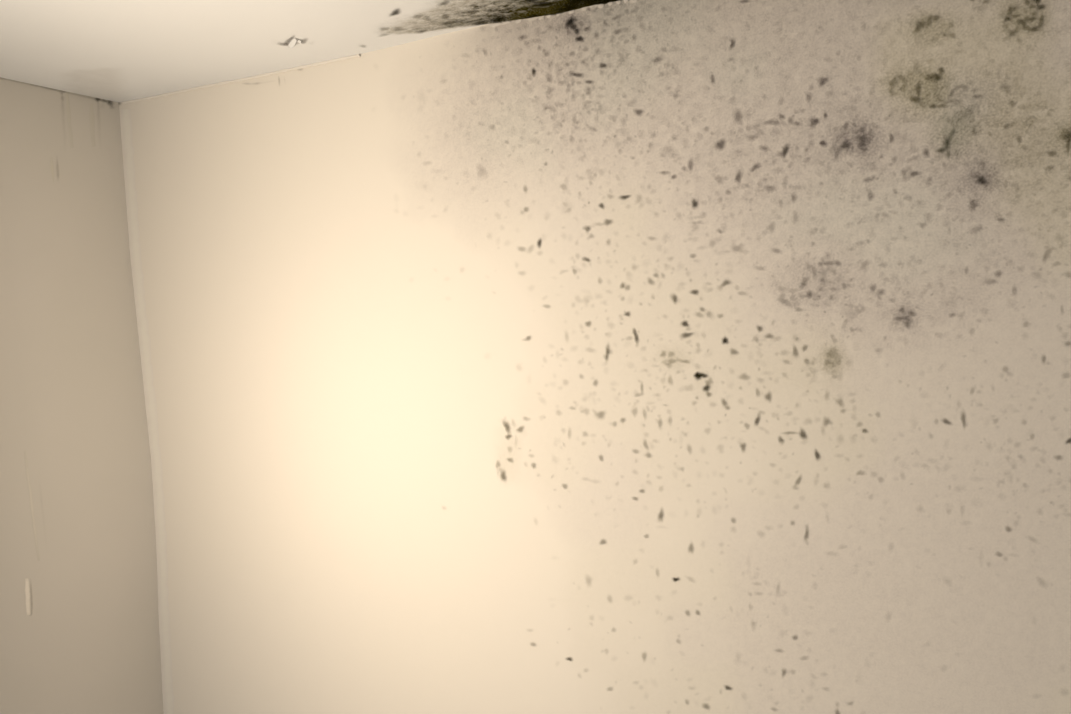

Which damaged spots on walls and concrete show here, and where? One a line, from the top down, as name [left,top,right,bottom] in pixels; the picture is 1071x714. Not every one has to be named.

damp [413,0,618,40]